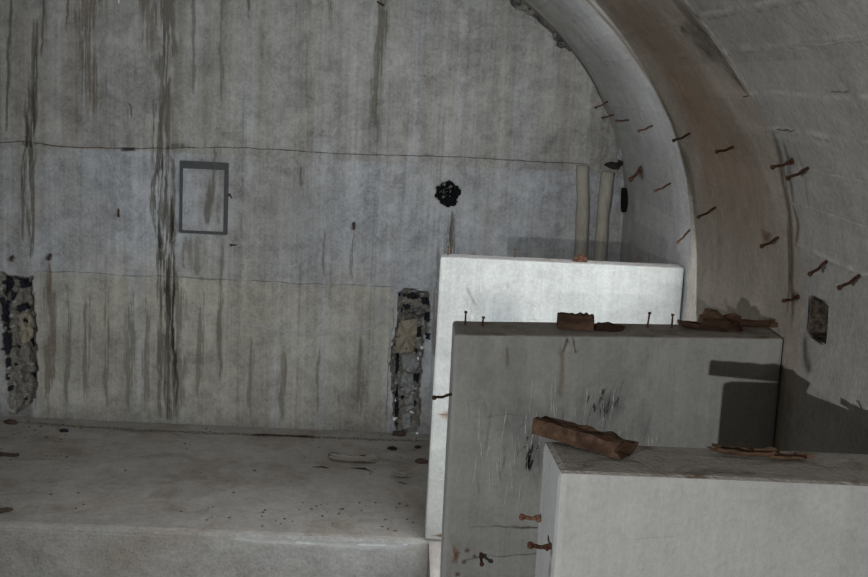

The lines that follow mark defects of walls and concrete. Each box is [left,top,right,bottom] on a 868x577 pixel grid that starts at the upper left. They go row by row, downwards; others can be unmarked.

leakage [21,1,45,253]
leakage [126,0,201,419]
leakage [205,151,220,223]
spalling [0,271,39,415]
leakage [217,246,375,407]
spalling [389,288,431,434]